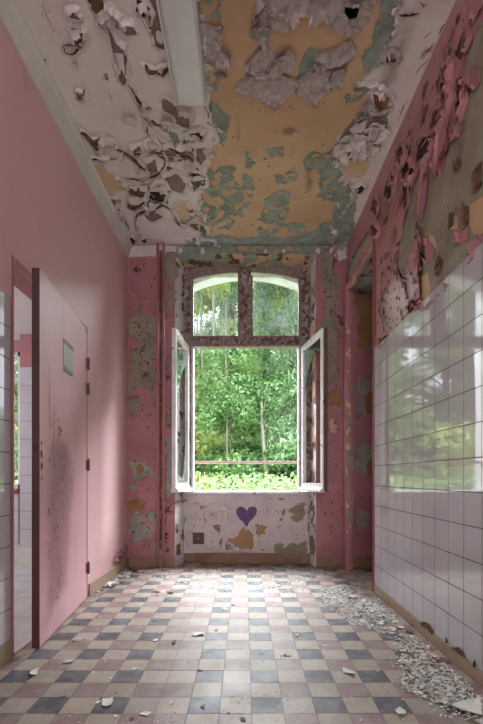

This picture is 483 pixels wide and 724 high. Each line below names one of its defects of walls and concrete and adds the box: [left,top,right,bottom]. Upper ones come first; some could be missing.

peeling [63,0,483,566]